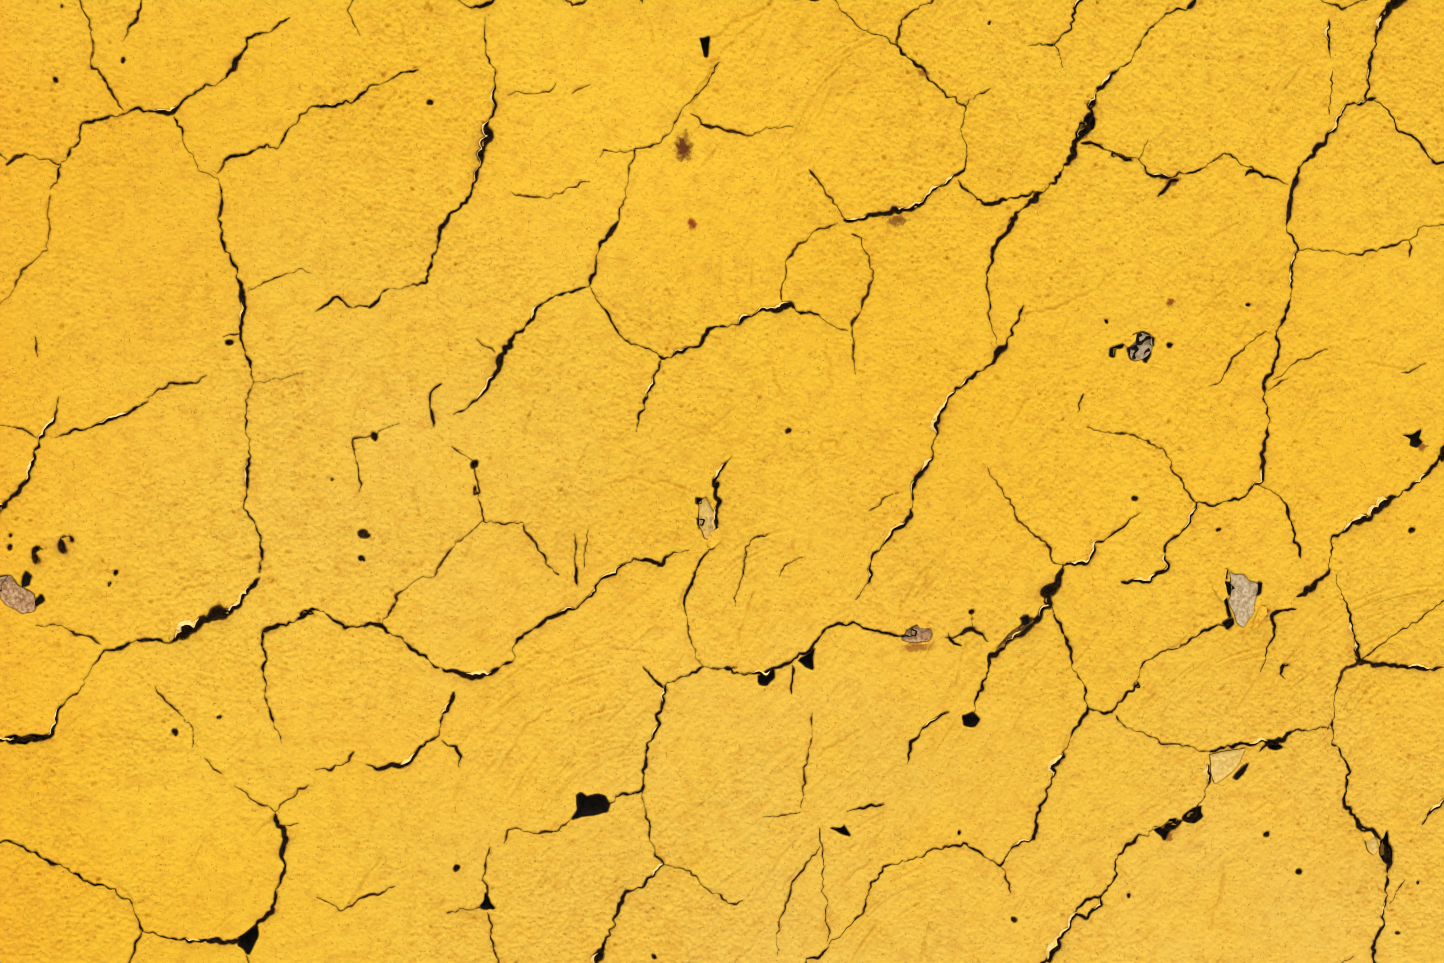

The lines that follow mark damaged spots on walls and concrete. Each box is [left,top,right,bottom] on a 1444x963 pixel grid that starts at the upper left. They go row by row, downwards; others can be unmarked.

crack [317,0,590,311]
crack [0,0,418,744]
spalling [1109,332,1173,363]
crack [429,0,1444,963]
spalling [0,536,74,613]
spalling [903,623,934,643]
spalling [1213,569,1267,630]
crack [0,446,912,963]
spalling [1210,749,1248,783]
spalling [572,793,609,819]